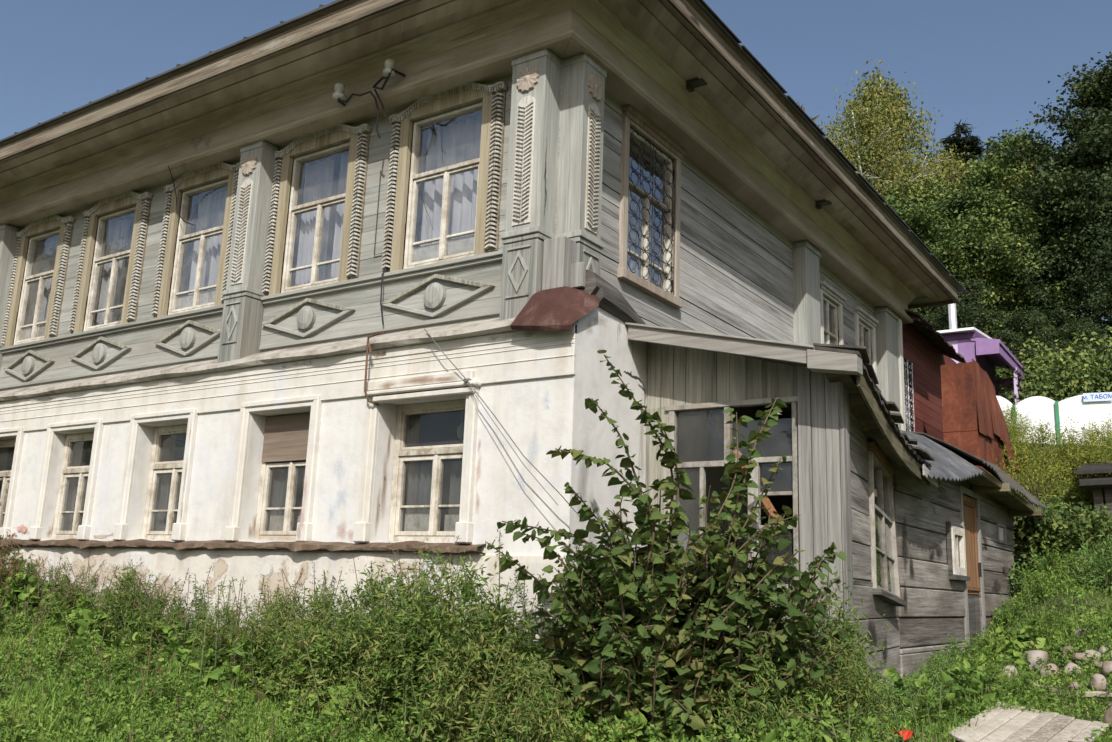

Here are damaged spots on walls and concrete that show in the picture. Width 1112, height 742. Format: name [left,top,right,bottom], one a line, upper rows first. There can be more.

flaking render [255,560,308,621]
water stain [903,521,914,609]